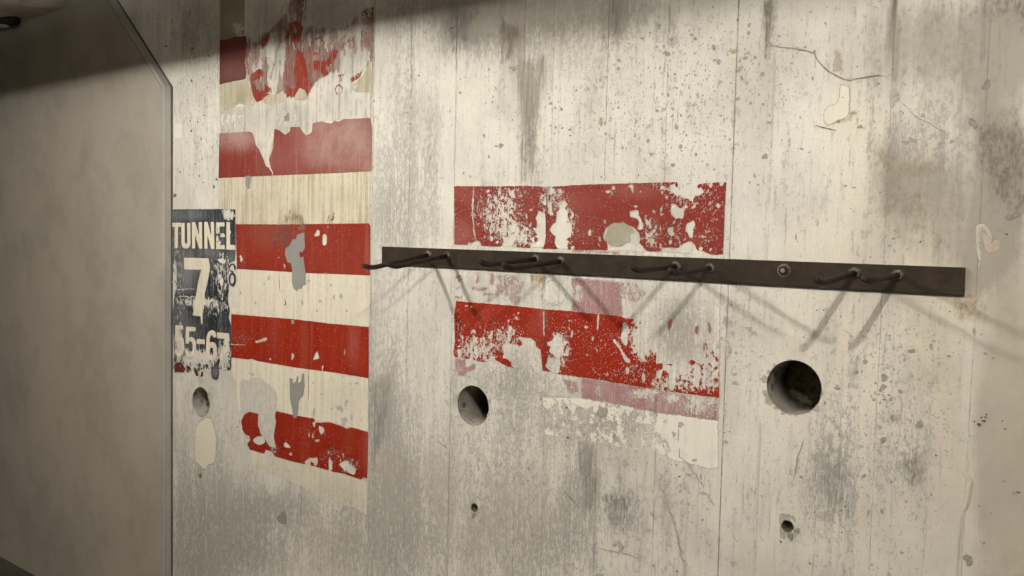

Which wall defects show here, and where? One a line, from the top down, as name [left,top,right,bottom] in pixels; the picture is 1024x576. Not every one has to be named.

peeling [219,0,381,167]
crack [766,38,886,81]
spalling [576,222,640,253]
peeling [239,373,367,514]